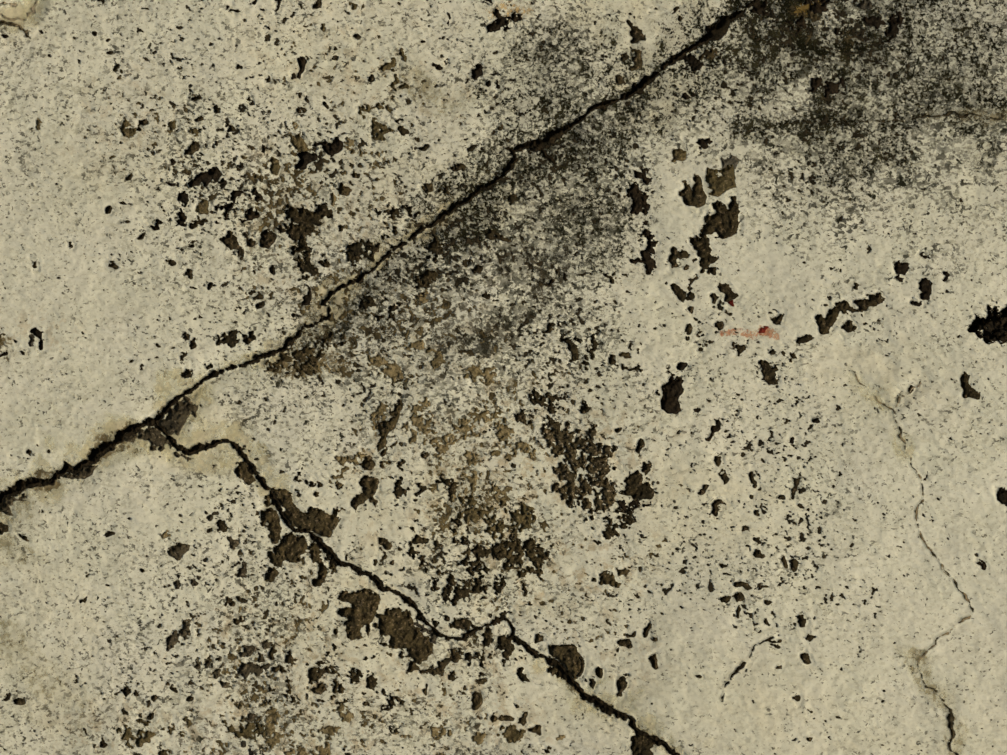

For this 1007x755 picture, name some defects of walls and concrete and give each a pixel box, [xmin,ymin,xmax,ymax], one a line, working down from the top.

crack [740,110,1007,133]
water stain [263,0,1007,379]
peeling [624,168,659,275]
peeling [668,155,741,330]
peeling [670,283,714,351]
spalling [968,301,1007,344]
crack [0,0,759,755]
peeling [181,354,658,755]
crack [852,370,974,755]
peeling [116,684,192,755]
peeling [145,619,191,654]
crack [721,636,774,702]